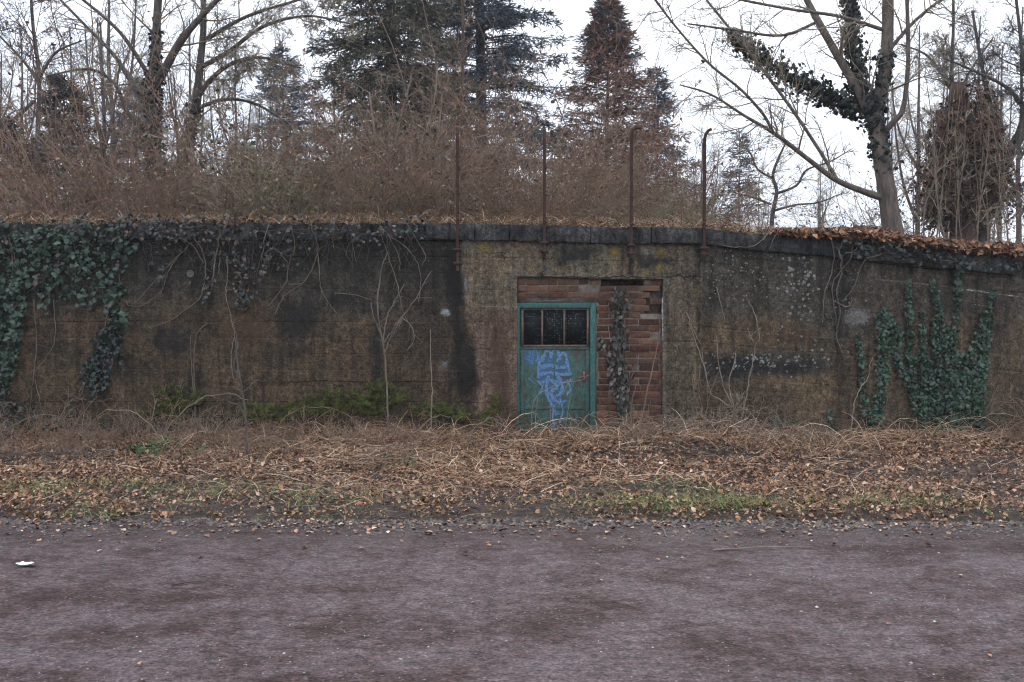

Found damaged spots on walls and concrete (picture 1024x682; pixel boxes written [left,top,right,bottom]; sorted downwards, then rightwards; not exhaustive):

leakage [442,252,475,407]